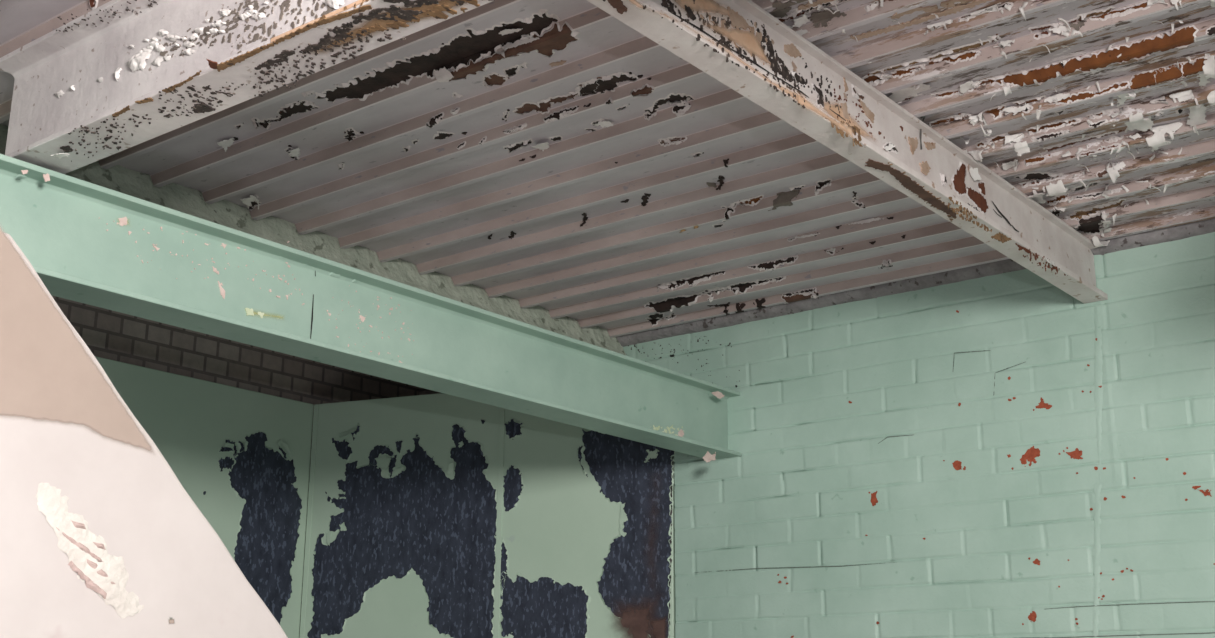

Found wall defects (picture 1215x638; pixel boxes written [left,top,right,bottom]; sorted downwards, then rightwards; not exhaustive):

peeling [603,0,627,14]
peeling [51,0,580,162]
peeling [502,72,696,161]
peeling [657,0,1215,248]
peeling [643,232,820,327]
peeling [1016,244,1068,276]
peeling [504,418,524,440]
peeling [1007,446,1040,470]
peeling [1059,447,1106,474]
peeling [217,430,303,625]
peeling [307,423,675,638]
corrosion [617,565,671,638]